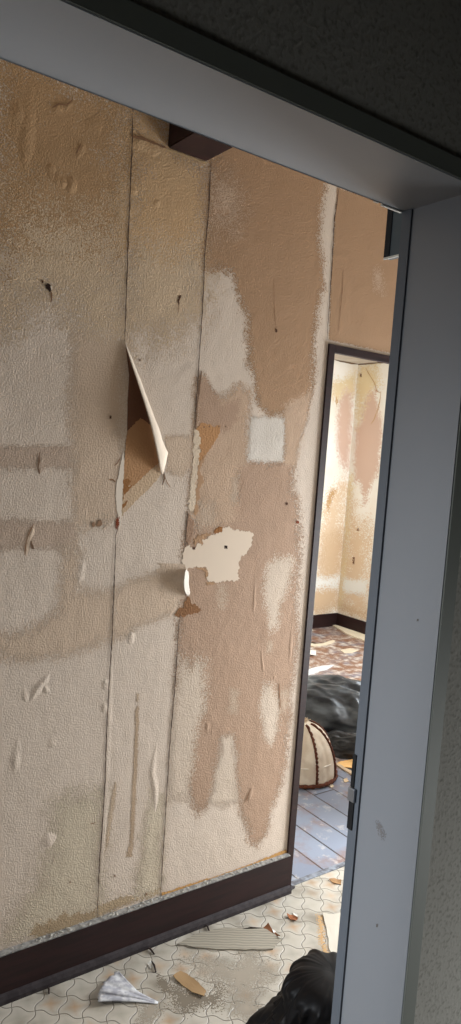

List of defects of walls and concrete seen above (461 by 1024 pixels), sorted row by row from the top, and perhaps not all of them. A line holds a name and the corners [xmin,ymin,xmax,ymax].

peeling [115,341,168,527]
peeling [175,423,254,617]